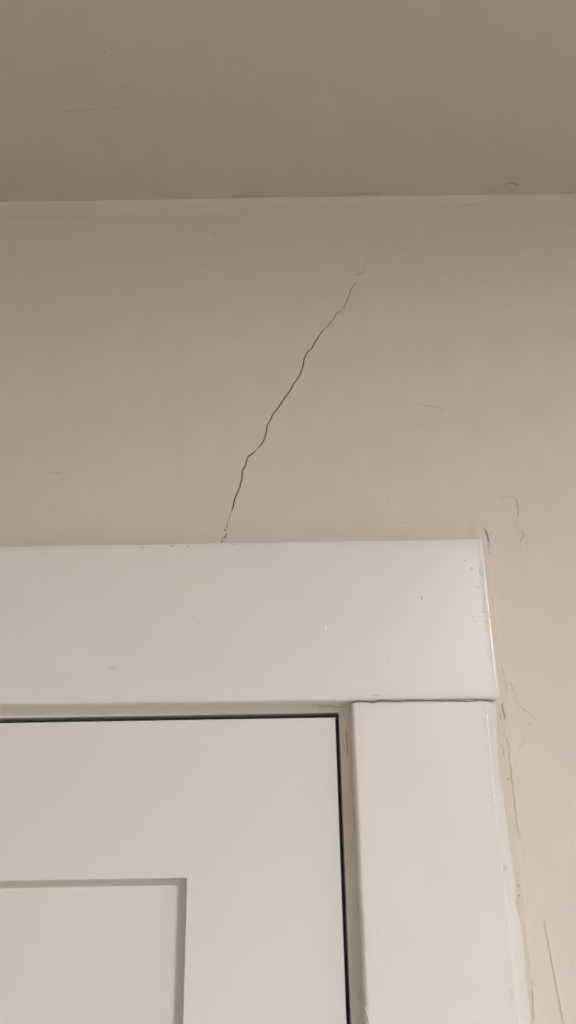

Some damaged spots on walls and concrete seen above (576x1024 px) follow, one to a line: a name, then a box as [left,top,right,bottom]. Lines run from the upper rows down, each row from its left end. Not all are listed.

crack [221,285,355,542]